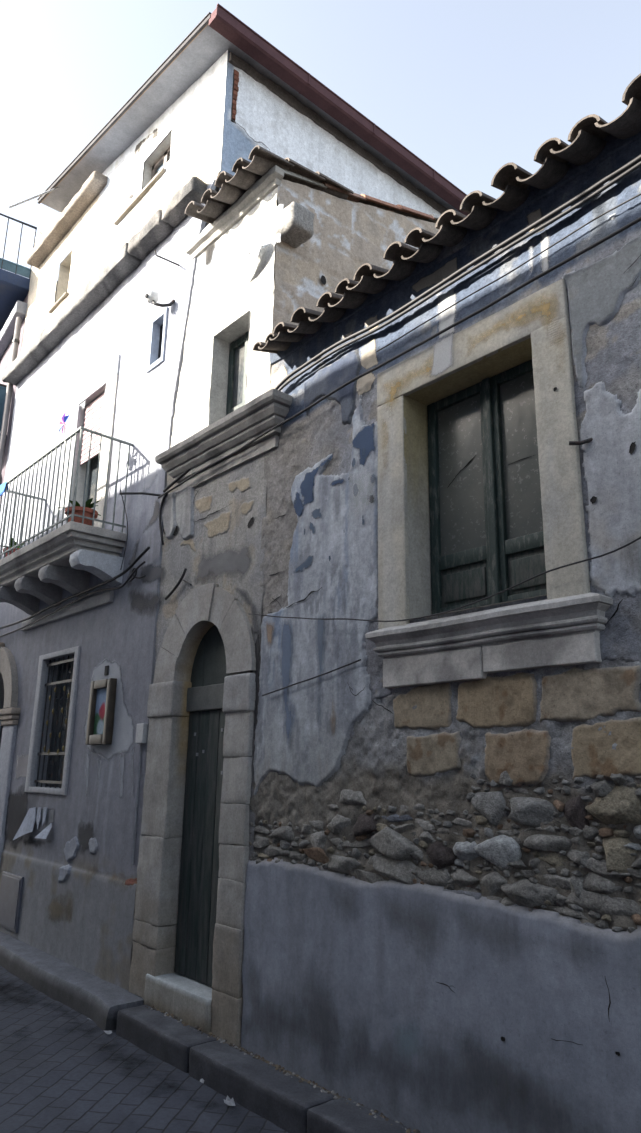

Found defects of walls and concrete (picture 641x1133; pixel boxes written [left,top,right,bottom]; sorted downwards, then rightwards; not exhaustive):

spalling [231,69,270,150]
flaking render [197,204,284,320]
peeling [412,257,457,292]
spalling [249,315,641,933]